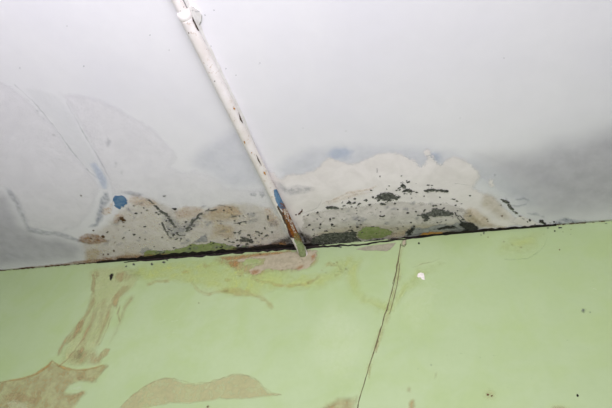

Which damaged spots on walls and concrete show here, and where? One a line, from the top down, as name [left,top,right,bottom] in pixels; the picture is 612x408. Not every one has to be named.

peeling [113,195,127,223]
peeling [144,198,398,275]
peeling [325,175,448,209]
leakage [268,149,541,244]
peeling [405,205,478,237]
crack [0,199,605,408]